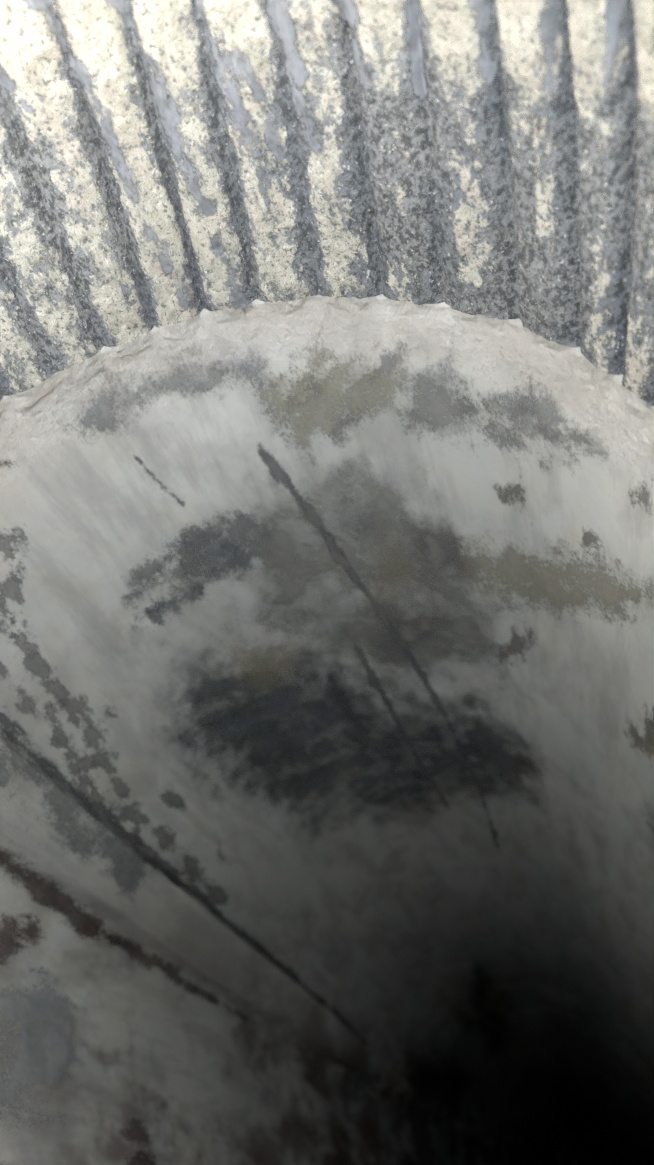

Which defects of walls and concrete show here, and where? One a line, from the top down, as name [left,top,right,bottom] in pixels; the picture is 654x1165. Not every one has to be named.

damp [125,529,238,625]
damp [170,648,533,831]
crack [0,713,368,1046]
damp [121,1118,155,1165]